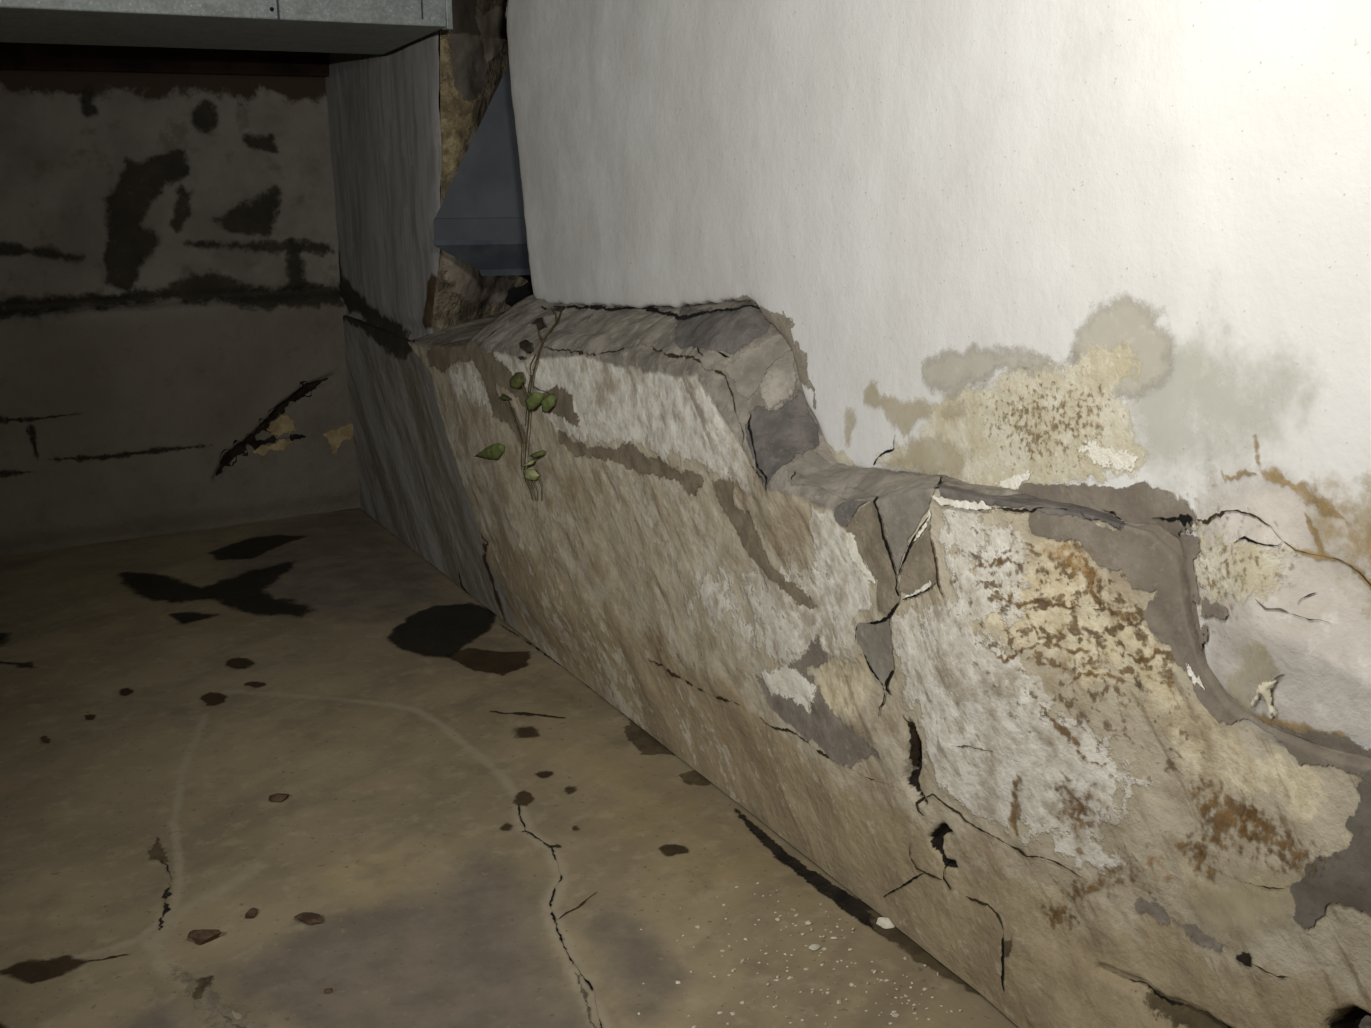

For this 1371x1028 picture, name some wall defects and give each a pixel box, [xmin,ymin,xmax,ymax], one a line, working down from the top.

water stain [0,149,437,359]
crack [0,378,354,478]
water stain [120,535,310,623]
water stain [388,603,530,675]
peeling [426,338,817,610]
peeling [755,635,879,768]
spalling [675,295,997,685]
crack [648,436,1081,878]
water stain [864,297,1172,490]
crack [990,506,1371,624]
peeling [1186,663,1205,690]
crack [734,809,1012,995]